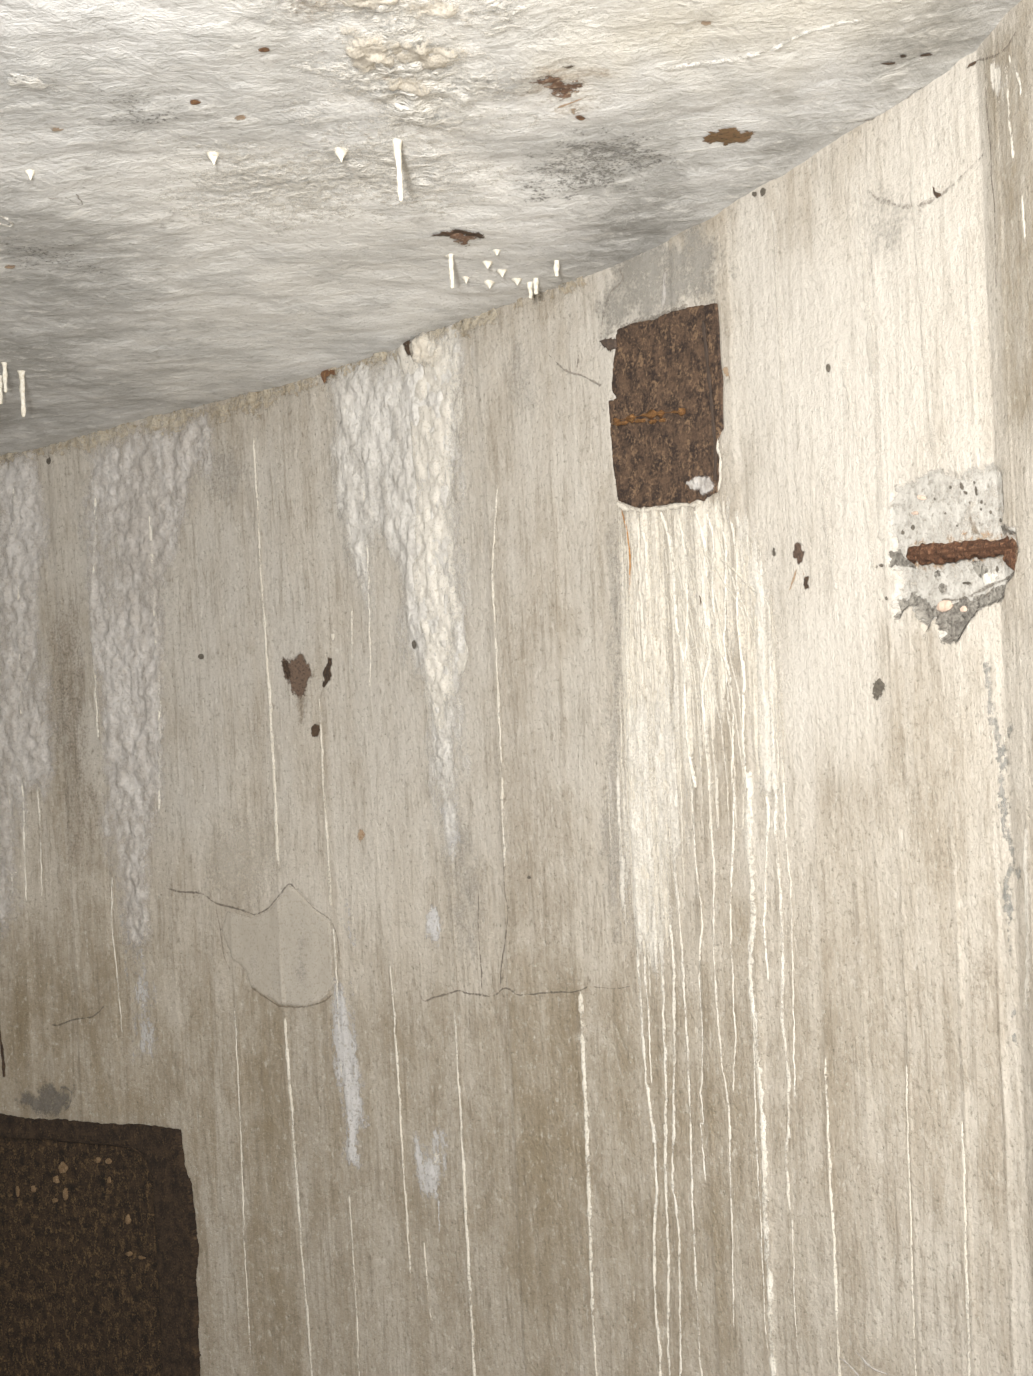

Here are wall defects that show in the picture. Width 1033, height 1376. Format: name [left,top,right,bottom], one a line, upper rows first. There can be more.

water stain [157,0,673,230]
rust [530,66,586,121]
rust [702,127,754,146]
rust [432,229,484,247]
spalling [875,463,1019,644]
water stain [0,276,585,1055]
rust [282,633,335,737]
crack [171,884,339,969]
water stain [606,497,798,1376]